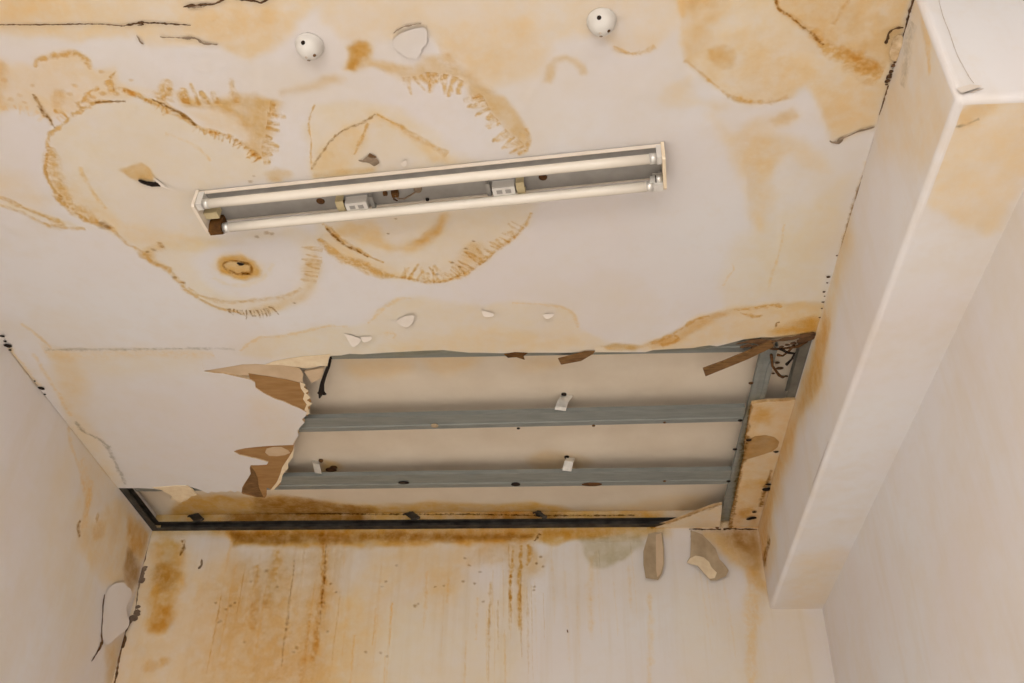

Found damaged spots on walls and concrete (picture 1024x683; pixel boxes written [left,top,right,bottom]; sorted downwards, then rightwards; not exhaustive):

peeling [393,23,427,59]
peeling [138,178,169,189]
leakage [737,332,816,378]
peeling [92,583,132,660]